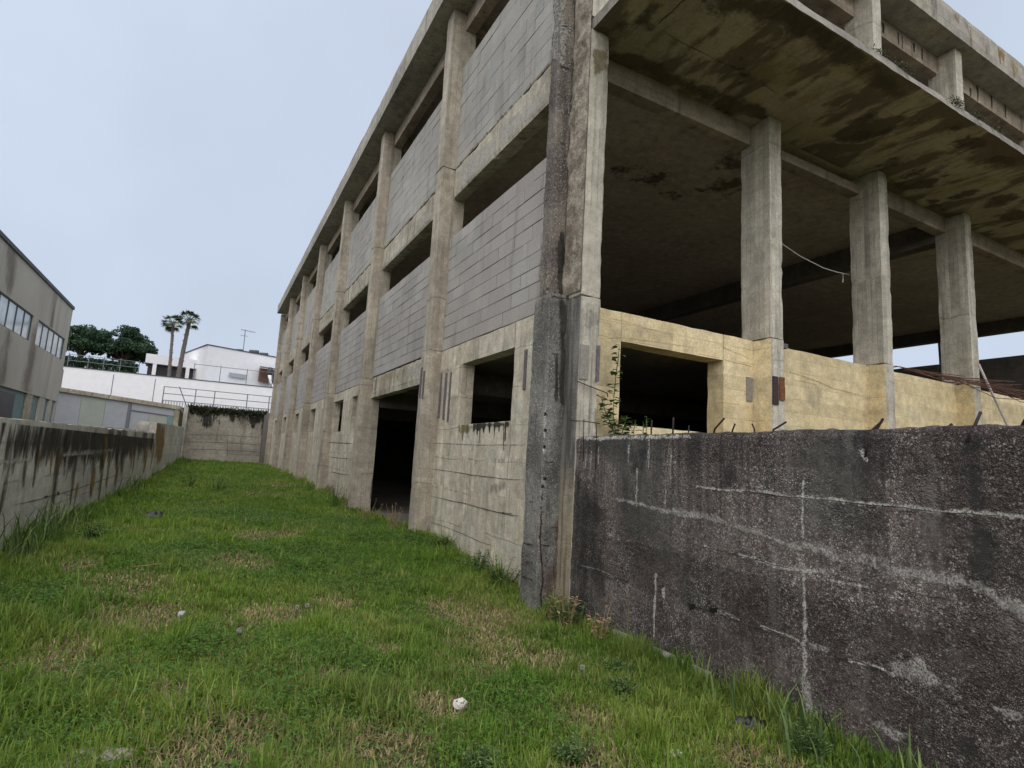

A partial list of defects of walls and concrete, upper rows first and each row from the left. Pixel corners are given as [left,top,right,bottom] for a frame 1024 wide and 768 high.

water stain [593,49,767,119]
water stain [708,0,904,100]
spalling [551,0,592,295]
water stain [698,154,742,192]
water stain [829,114,916,144]
water stain [555,231,569,405]
water stain [0,423,154,516]
water stain [458,421,509,461]
crack [418,443,556,607]
crack [696,485,1024,520]
crack [686,541,963,602]
crack [687,605,895,677]